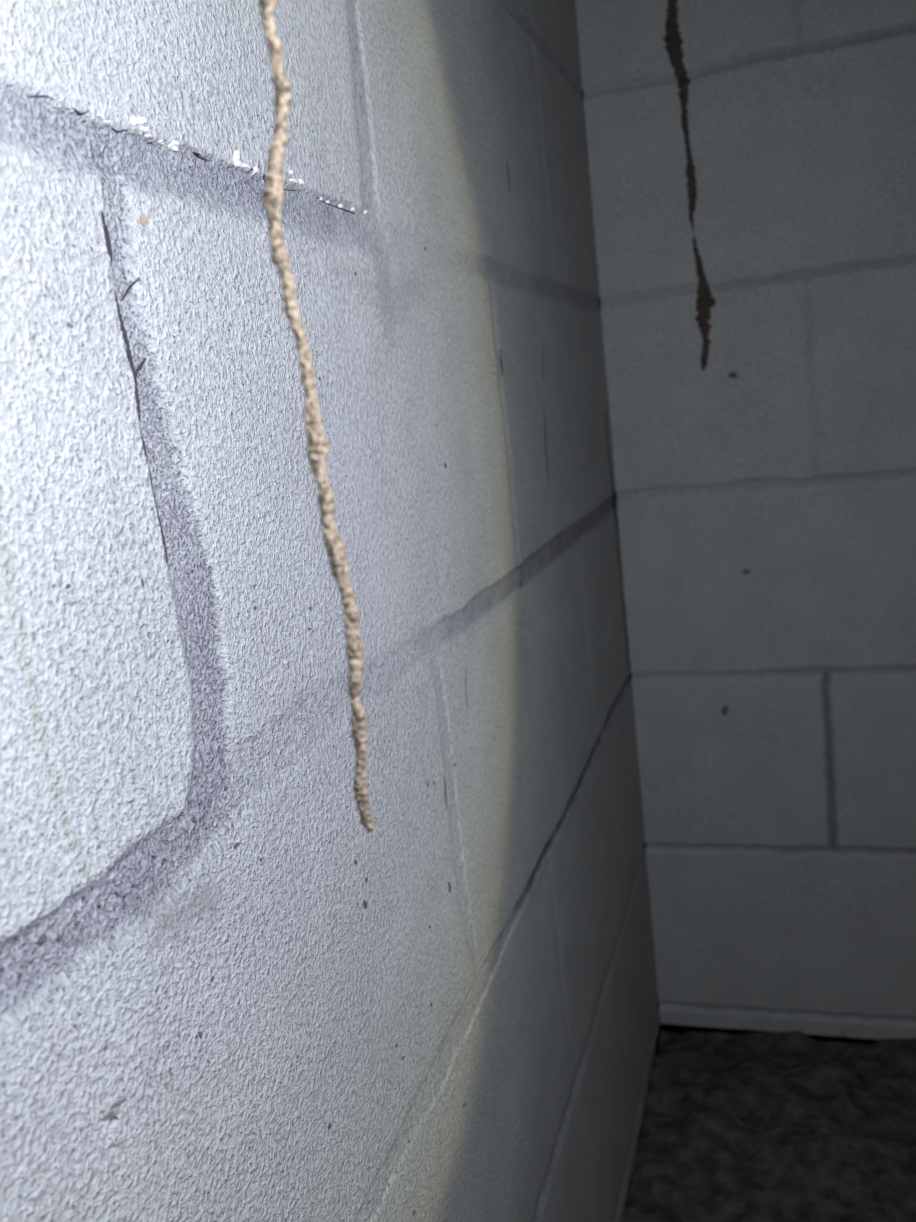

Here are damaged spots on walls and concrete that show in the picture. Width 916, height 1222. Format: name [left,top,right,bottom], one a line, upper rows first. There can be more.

crack [28,95,154,145]
crack [260,174,356,214]